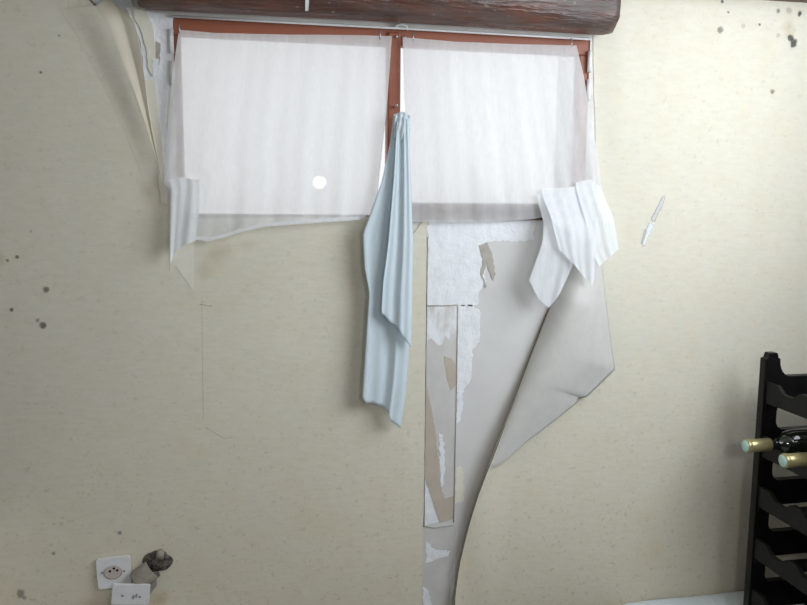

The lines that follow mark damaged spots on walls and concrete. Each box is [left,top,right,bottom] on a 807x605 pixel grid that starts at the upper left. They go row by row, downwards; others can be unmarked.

spalling [93,0,173,172]
flaking render [423,220,549,605]